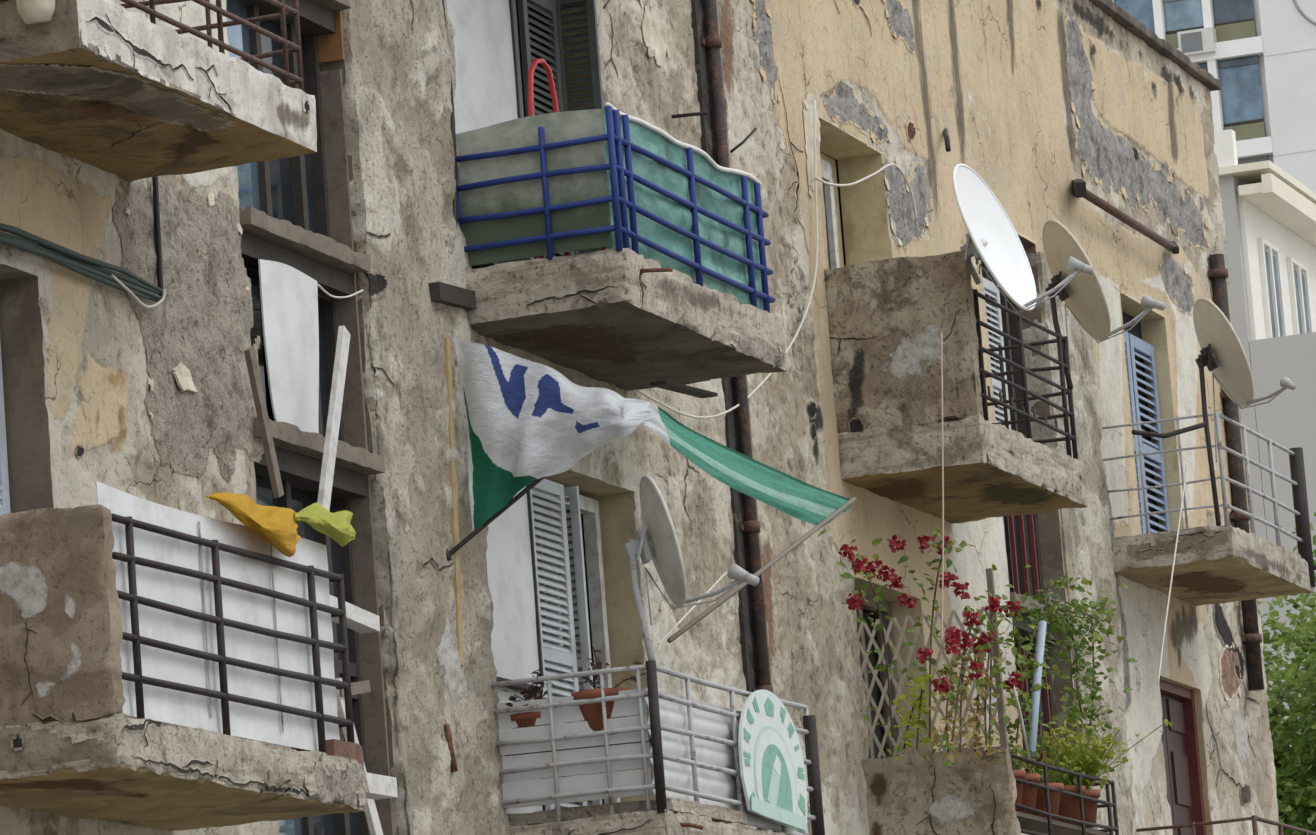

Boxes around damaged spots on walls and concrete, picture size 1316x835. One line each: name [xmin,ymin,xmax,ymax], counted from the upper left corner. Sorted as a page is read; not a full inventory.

crack [86,13,233,114]
crack [834,0,872,37]
flaking render [883,0,915,54]
damp [168,123,217,159]
flaking render [803,80,929,253]
flaking render [1065,14,1210,314]
damp [983,483,1056,505]
damp [1246,549,1301,583]
corrosion [763,542,774,684]
crack [13,574,338,799]
crack [566,819,655,835]
crack [916,757,937,835]